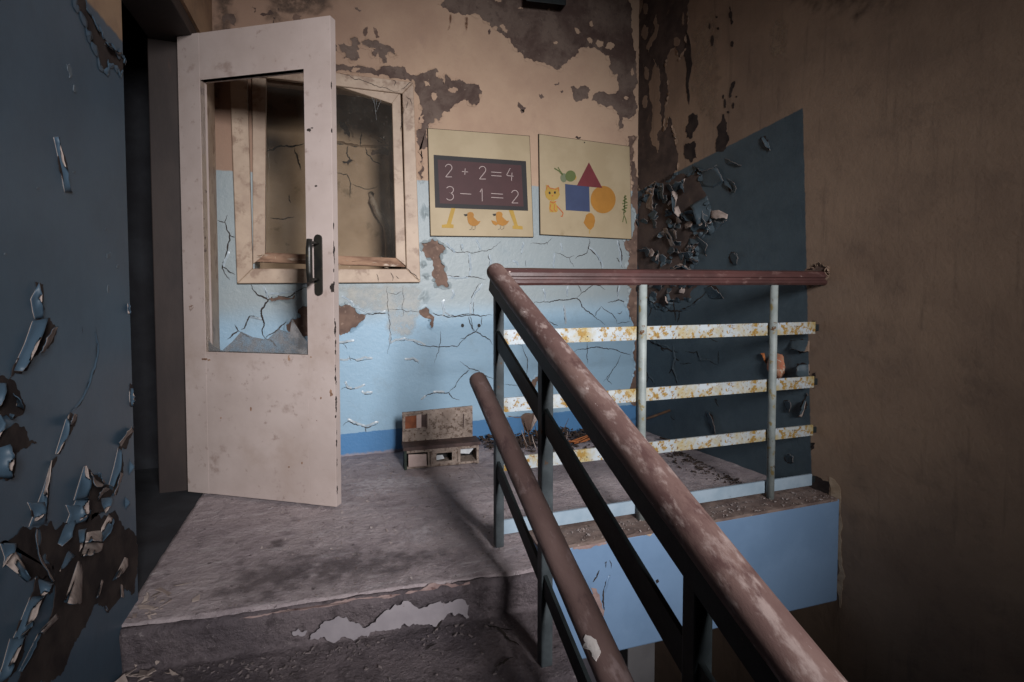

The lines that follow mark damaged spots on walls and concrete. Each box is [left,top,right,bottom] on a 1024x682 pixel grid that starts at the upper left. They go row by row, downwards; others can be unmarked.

crack [267,143,304,170]
peeling [331,27,482,184]
spalling [438,0,741,270]
peeling [0,282,59,481]
crack [218,216,307,347]
peeling [320,301,366,418]
crack [346,418,379,431]
peeling [419,237,452,290]
crack [339,238,719,400]
peeling [624,285,724,326]
peeling [0,412,138,682]
peeling [240,581,470,643]